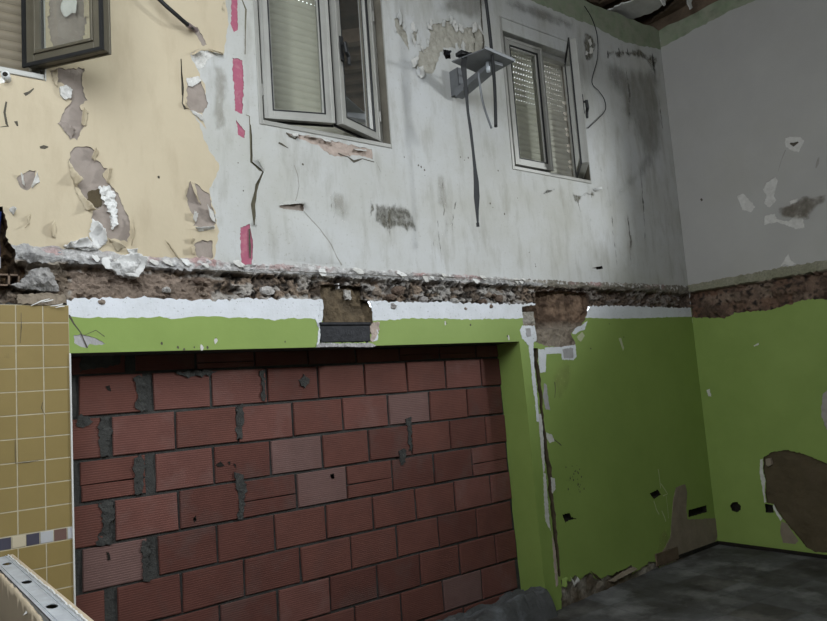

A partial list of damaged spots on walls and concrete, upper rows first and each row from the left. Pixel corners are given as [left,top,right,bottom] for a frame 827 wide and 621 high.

peeling [181,27,223,122]
peeling [394,9,483,78]
leakage [371,205,415,230]
spalling [0,58,827,319]
leakage [782,198,822,217]
crack [528,346,561,587]
spalling [760,450,827,553]
spalling [561,562,659,607]